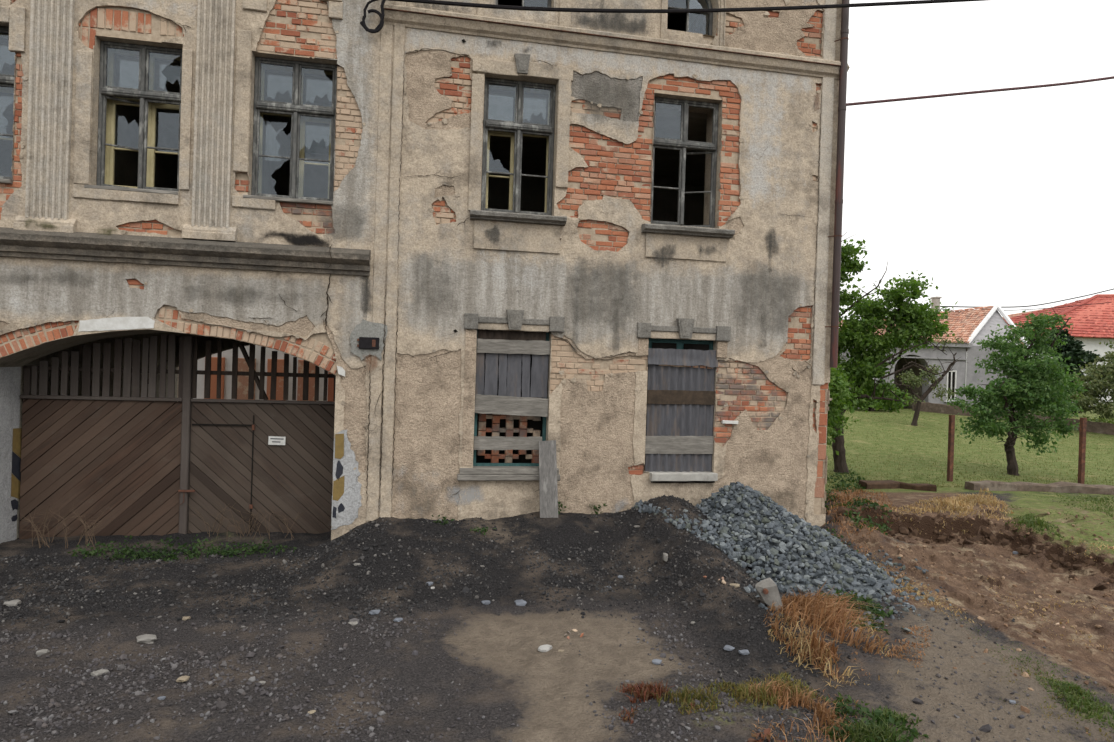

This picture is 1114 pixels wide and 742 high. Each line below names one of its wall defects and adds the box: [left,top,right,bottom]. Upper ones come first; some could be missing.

flaking render [74,0,184,49]
flaking render [703,0,824,58]
flaking render [0,53,28,220]
flaking render [256,0,365,191]
flaking render [404,39,483,131]
flaking render [553,71,745,252]
flaking render [117,220,182,237]
flaking render [280,202,335,235]
damp [656,247,674,267]
flaking render [0,317,79,357]
flaking render [155,305,368,481]
flaking render [708,304,832,521]